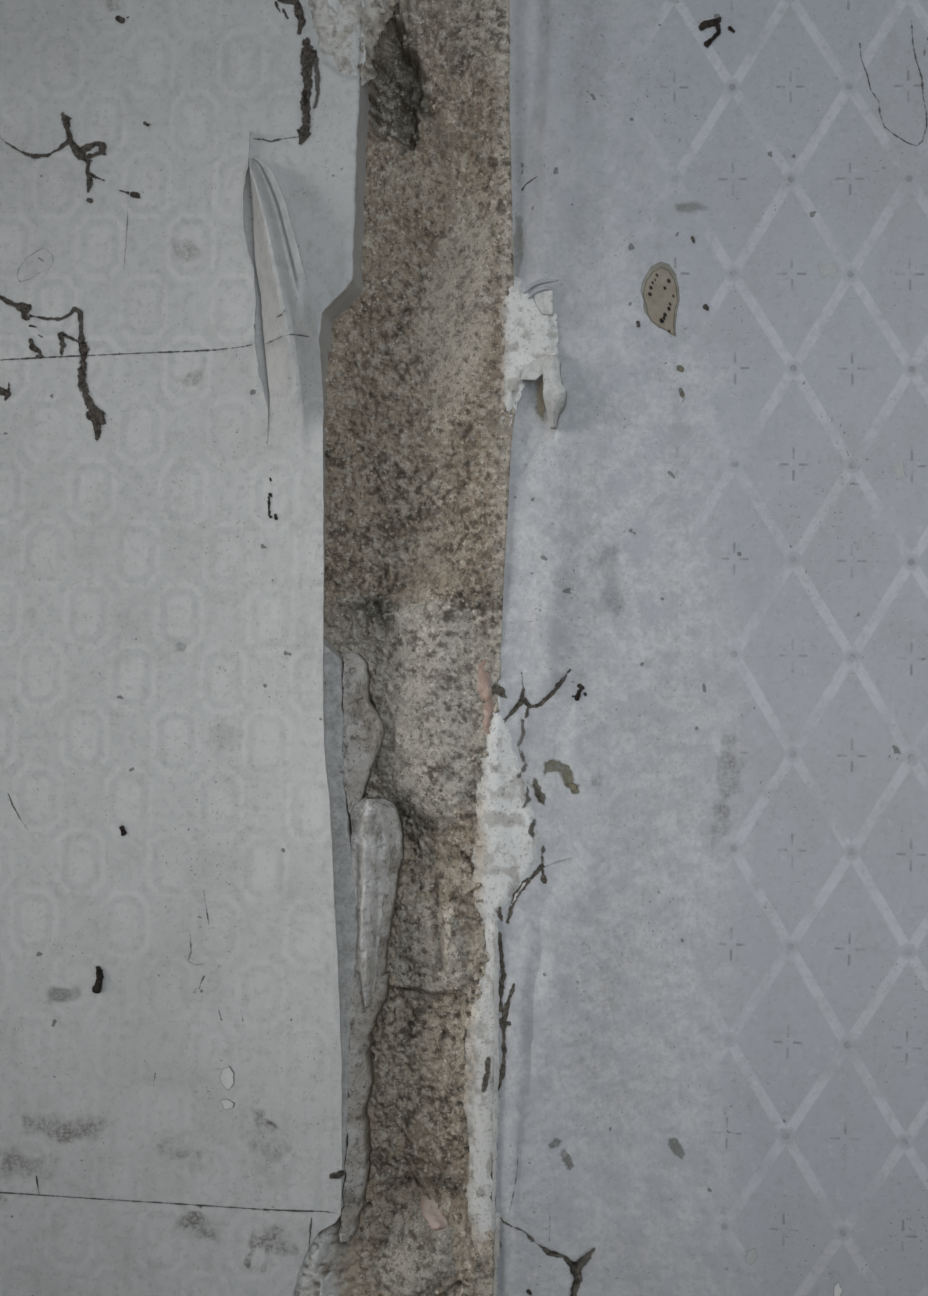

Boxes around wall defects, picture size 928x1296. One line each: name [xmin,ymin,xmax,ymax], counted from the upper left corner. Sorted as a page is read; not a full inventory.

crack [254,0,320,145]
crack [6,112,106,203]
crack [0,250,309,441]
spalling [295,0,567,1296]
crack [491,669,571,723]
crack [481,864,547,1103]
crack [490,1148,595,1296]